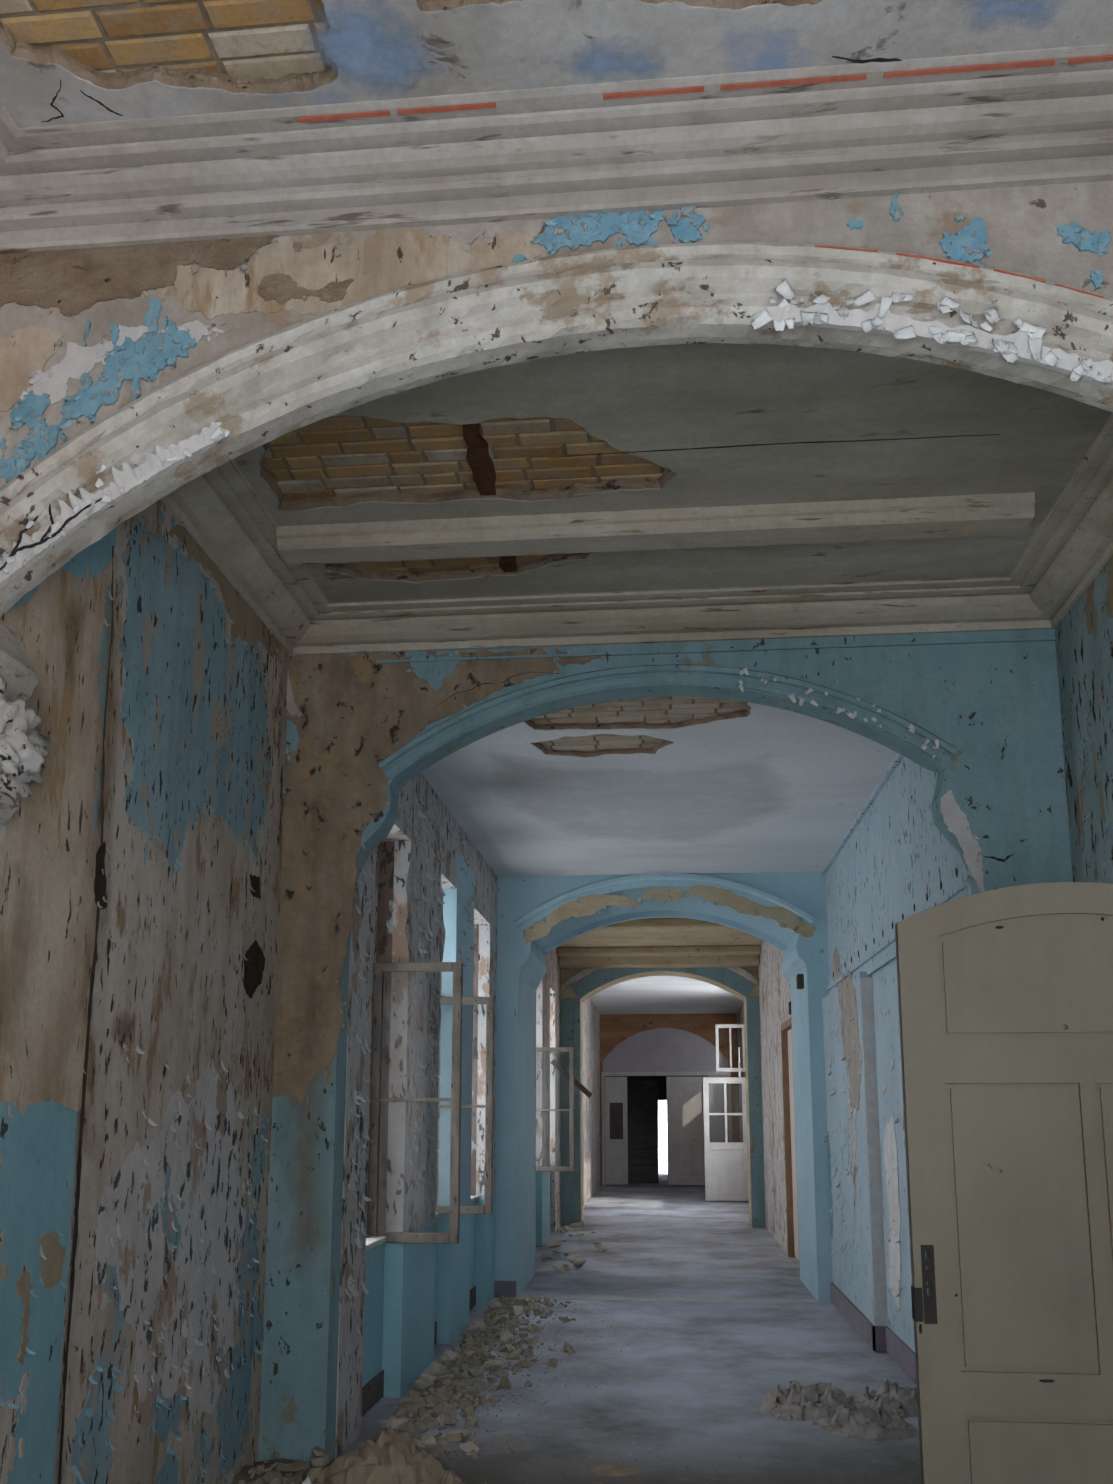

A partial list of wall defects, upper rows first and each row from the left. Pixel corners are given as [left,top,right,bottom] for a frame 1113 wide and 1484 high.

spalling [0,0,338,94]
spalling [642,0,822,10]
spalling [0,206,710,489]
peeling [751,279,1113,389]
crack [0,498,102,571]
peeling [0,421,232,589]
spalling [259,415,677,511]
crack [100,546,113,845]
spalling [525,668,942,762]
peeling [522,885,817,945]
peeling [0,511,603,1484]
crack [58,909,100,1484]